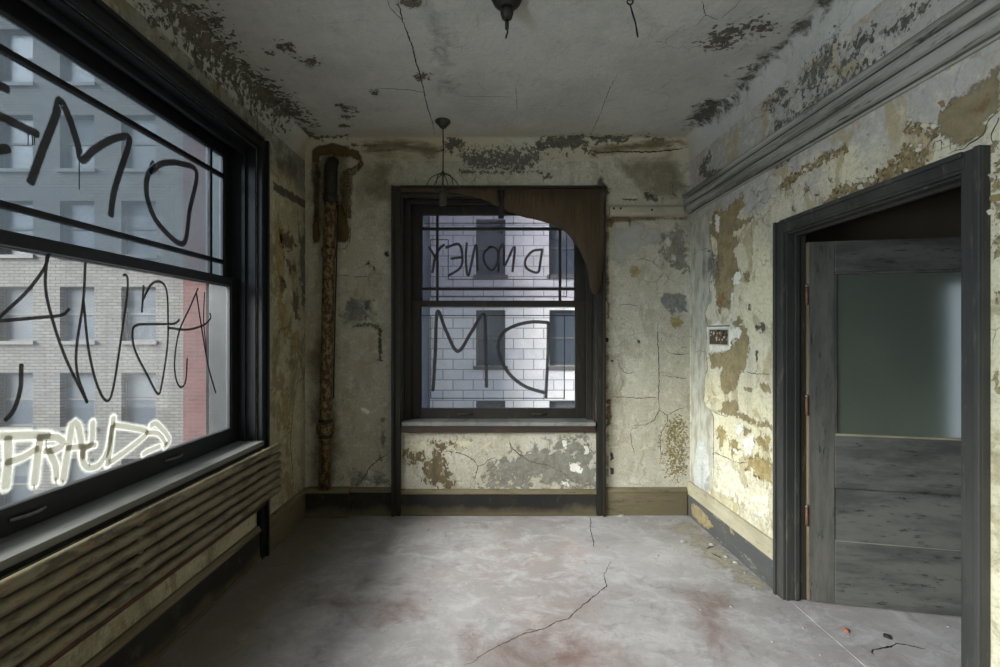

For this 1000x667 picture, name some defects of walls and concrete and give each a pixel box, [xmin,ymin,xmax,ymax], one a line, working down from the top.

peeling [131,0,370,149]
crack [381,2,435,135]
peeling [440,132,670,180]
peeling [693,13,783,51]
peeling [761,0,939,137]
spalling [775,66,1000,213]
crack [617,243,746,484]
peeling [656,191,773,535]
flaking render [402,433,596,489]
crack [445,435,575,483]
leakage [658,410,690,484]
crack [465,565,609,665]